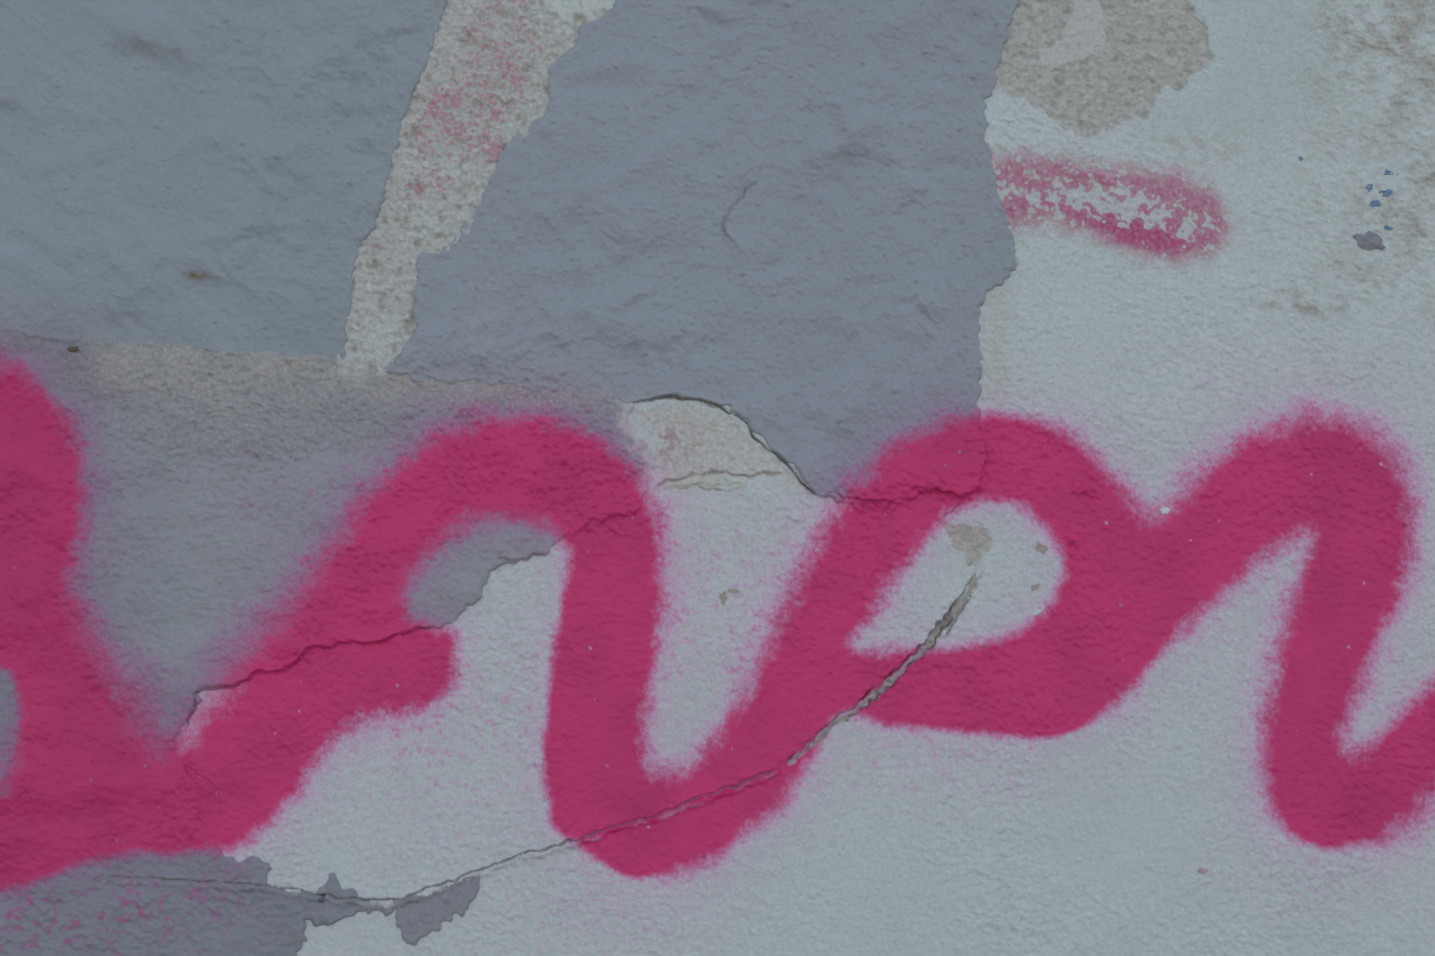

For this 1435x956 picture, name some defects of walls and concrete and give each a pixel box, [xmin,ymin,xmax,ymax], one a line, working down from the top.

peeling [993,0,1216,140]
peeling [337,0,615,375]
peeling [632,401,814,501]
crack [497,392,989,564]
spalling [943,522,995,571]
crack [95,566,986,911]
peeling [366,877,480,946]